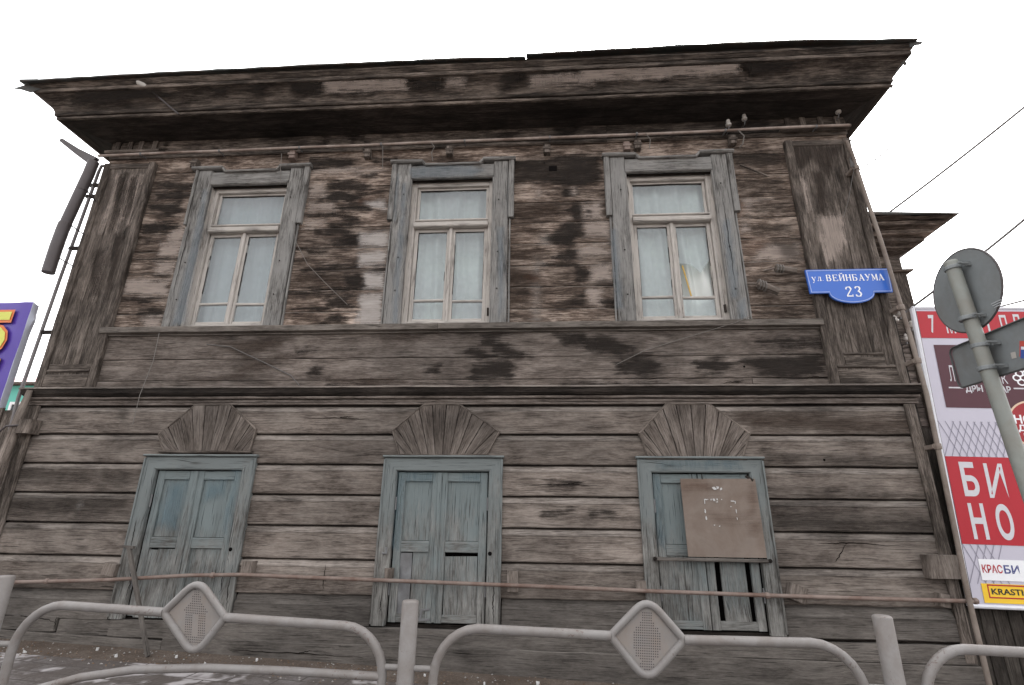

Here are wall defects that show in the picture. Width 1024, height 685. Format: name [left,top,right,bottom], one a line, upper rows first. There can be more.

damp [137,182,193,245]
damp [288,136,398,325]
damp [510,153,615,310]
damp [132,256,178,281]
damp [121,295,168,318]
damp [307,333,535,392]
damp [553,332,669,385]